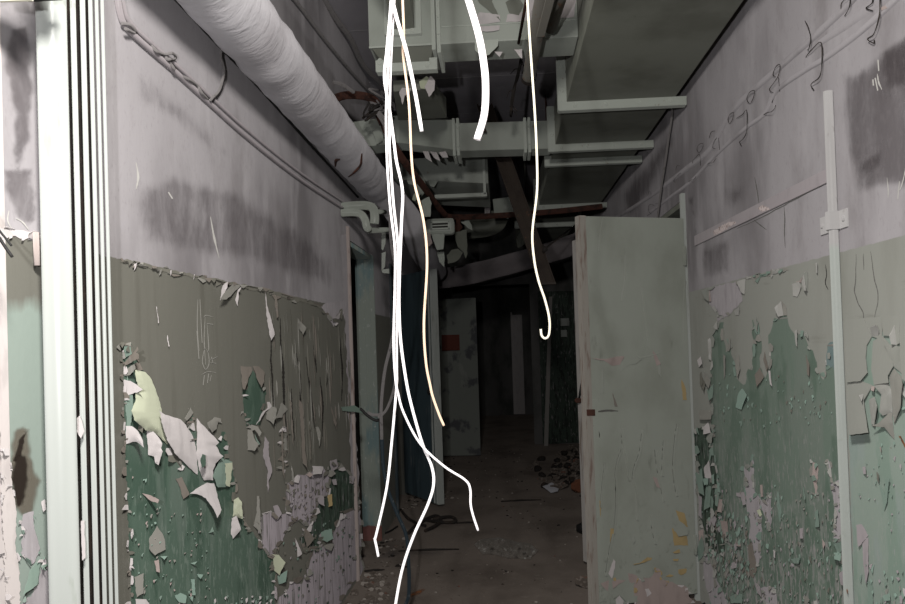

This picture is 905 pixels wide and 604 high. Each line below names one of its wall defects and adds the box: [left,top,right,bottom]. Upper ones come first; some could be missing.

peeling [0,403,49,604]
peeling [117,234,365,604]
peeling [666,263,905,604]
crack [854,251,878,318]